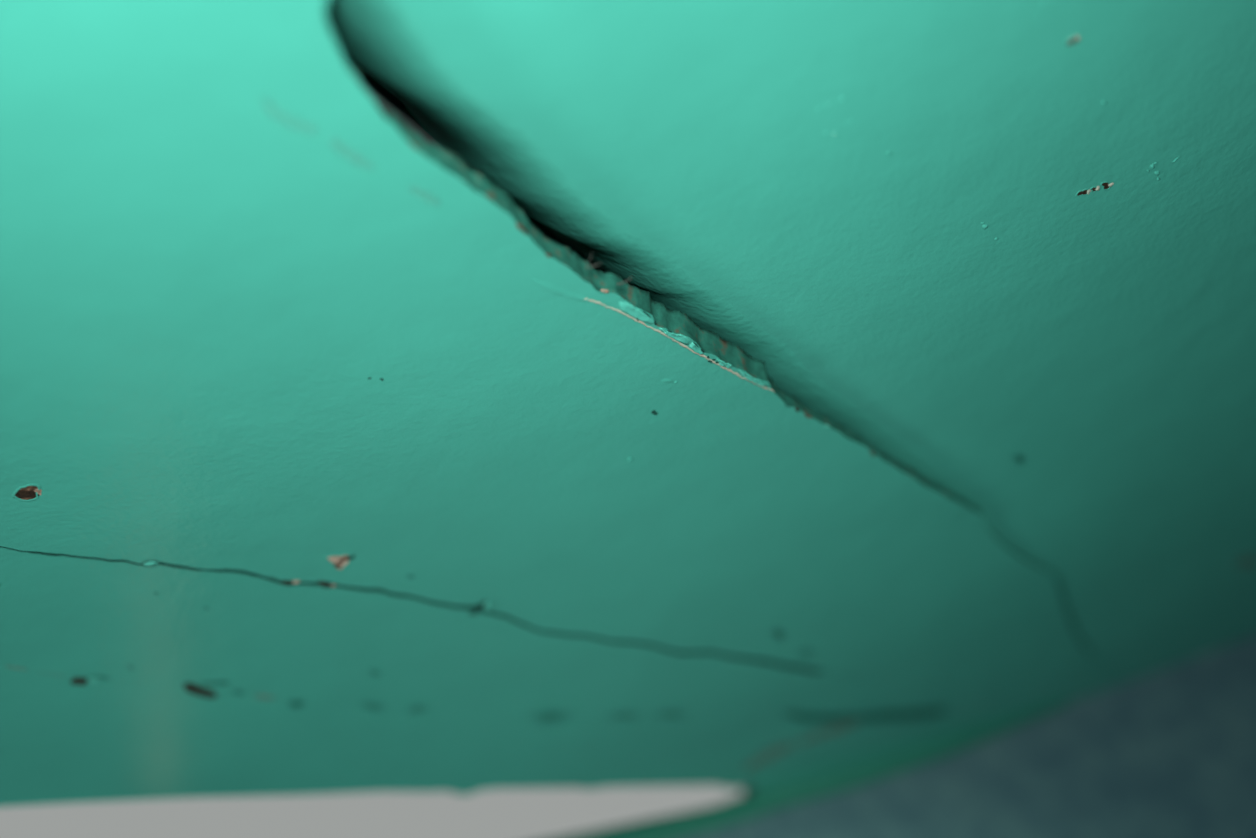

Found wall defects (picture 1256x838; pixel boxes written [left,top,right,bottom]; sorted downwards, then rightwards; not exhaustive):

peeling [1075,181,1114,197]
crack [324,0,1122,678]
peeling [12,484,42,502]
peeling [323,553,355,572]
crack [0,546,827,673]
crack [10,667,110,685]
crack [183,682,302,707]